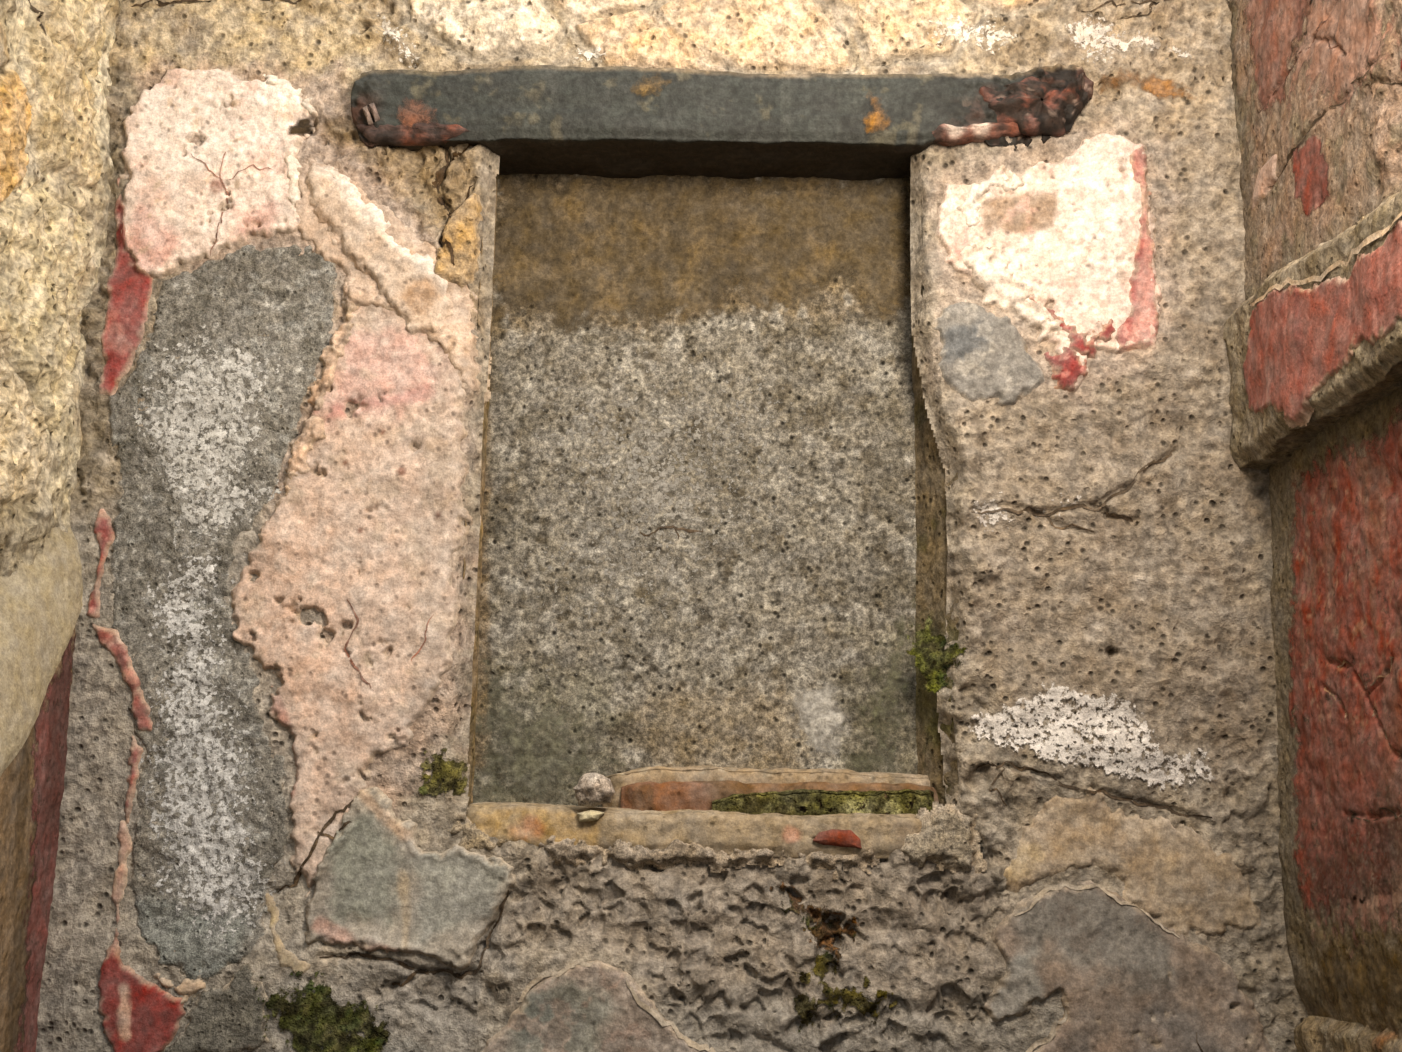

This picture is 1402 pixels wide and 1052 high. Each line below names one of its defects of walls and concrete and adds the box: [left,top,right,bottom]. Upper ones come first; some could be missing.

crack [28,0,46,34]
crack [1081,0,1167,19]
crack [1259,0,1402,188]
peeling [1243,212,1402,429]
crack [971,450,1175,534]
peeling [1288,405,1402,958]
leakage [968,682,1216,790]